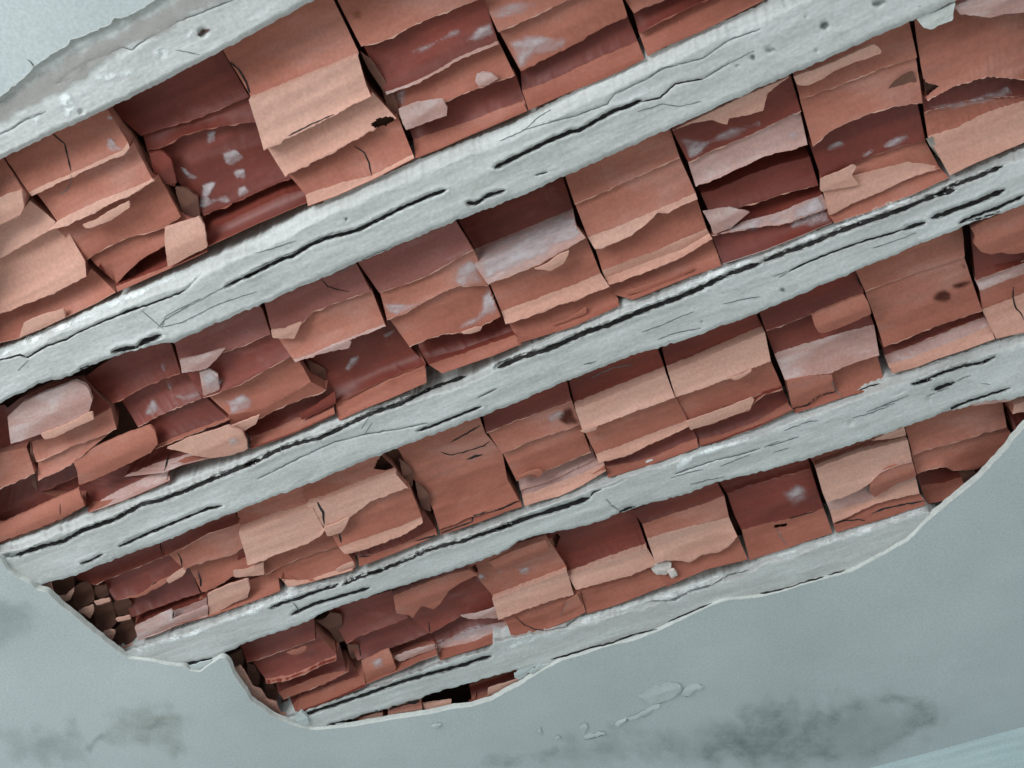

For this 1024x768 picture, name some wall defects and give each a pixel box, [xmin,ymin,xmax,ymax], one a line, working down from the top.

crack [467,29,759,205]
peeling [673,43,881,131]
peeling [2,308,96,356]
peeling [108,183,214,308]
crack [0,166,1023,587]
spalling [642,260,752,306]
peeling [687,397,754,430]
crack [271,489,633,615]
flaking render [0,411,1024,730]
crack [551,570,747,660]
crack [760,570,844,594]
crack [307,622,491,725]